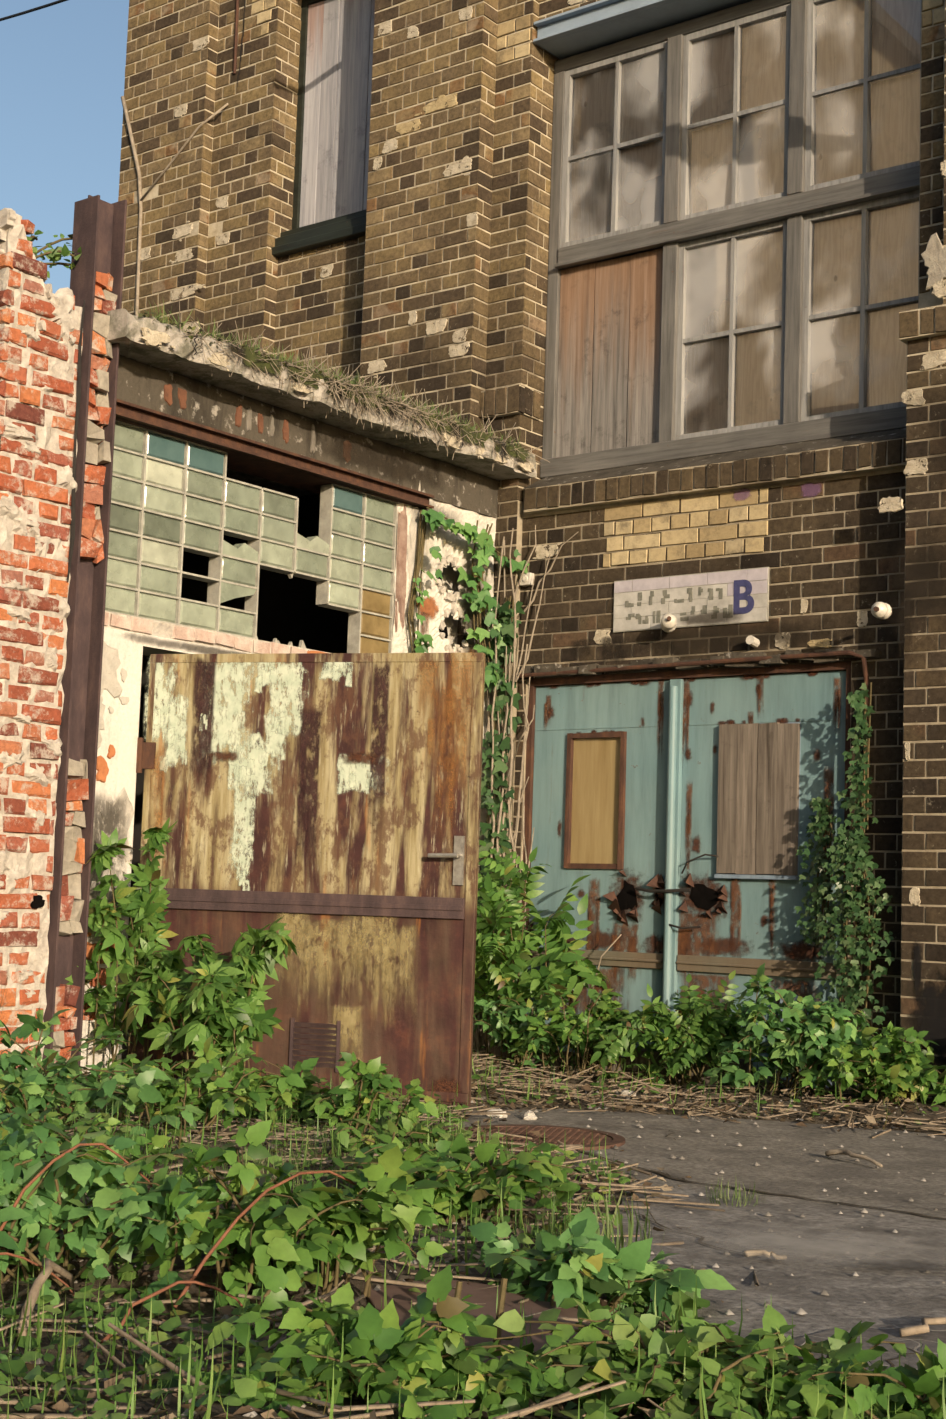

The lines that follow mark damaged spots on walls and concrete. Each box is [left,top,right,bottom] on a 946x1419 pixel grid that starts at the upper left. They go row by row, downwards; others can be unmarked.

spalling [394,482,421,633]
spalling [436,555,469,653]
corrosion [190,660,237,776]
peeling [92,640,353,891]
corrosion [296,710,321,855]
peeling [337,754,387,794]
corrosion [343,665,390,812]
corrosion [682,678,695,759]
spalling [30,895,45,909]
corrosion [555,878,749,1021]
crack [574,1122,946,1219]
crack [613,1207,760,1258]